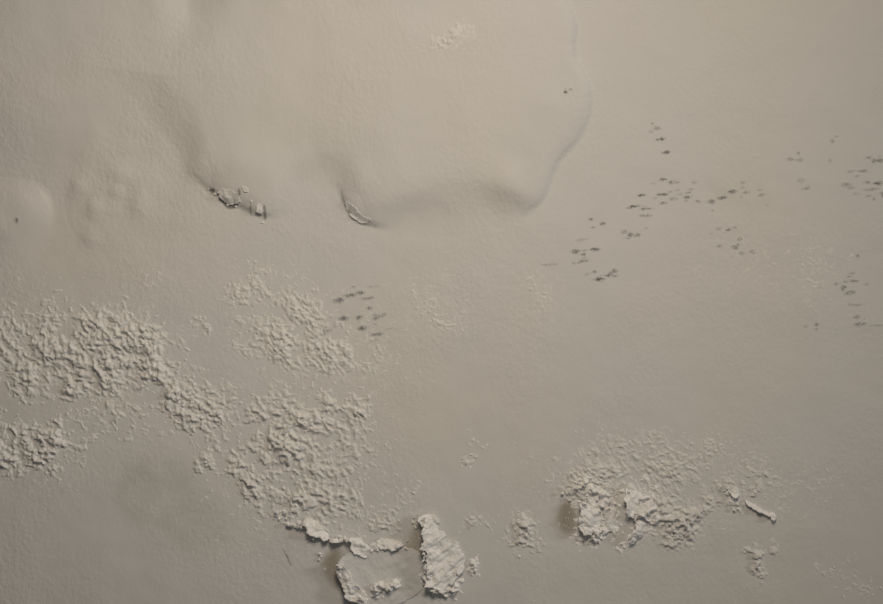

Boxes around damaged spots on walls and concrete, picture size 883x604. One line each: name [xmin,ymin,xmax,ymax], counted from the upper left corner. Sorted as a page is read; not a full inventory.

peeling [207,186,266,224]
peeling [560,468,665,555]
peeling [720,485,776,521]
peeling [274,509,481,604]